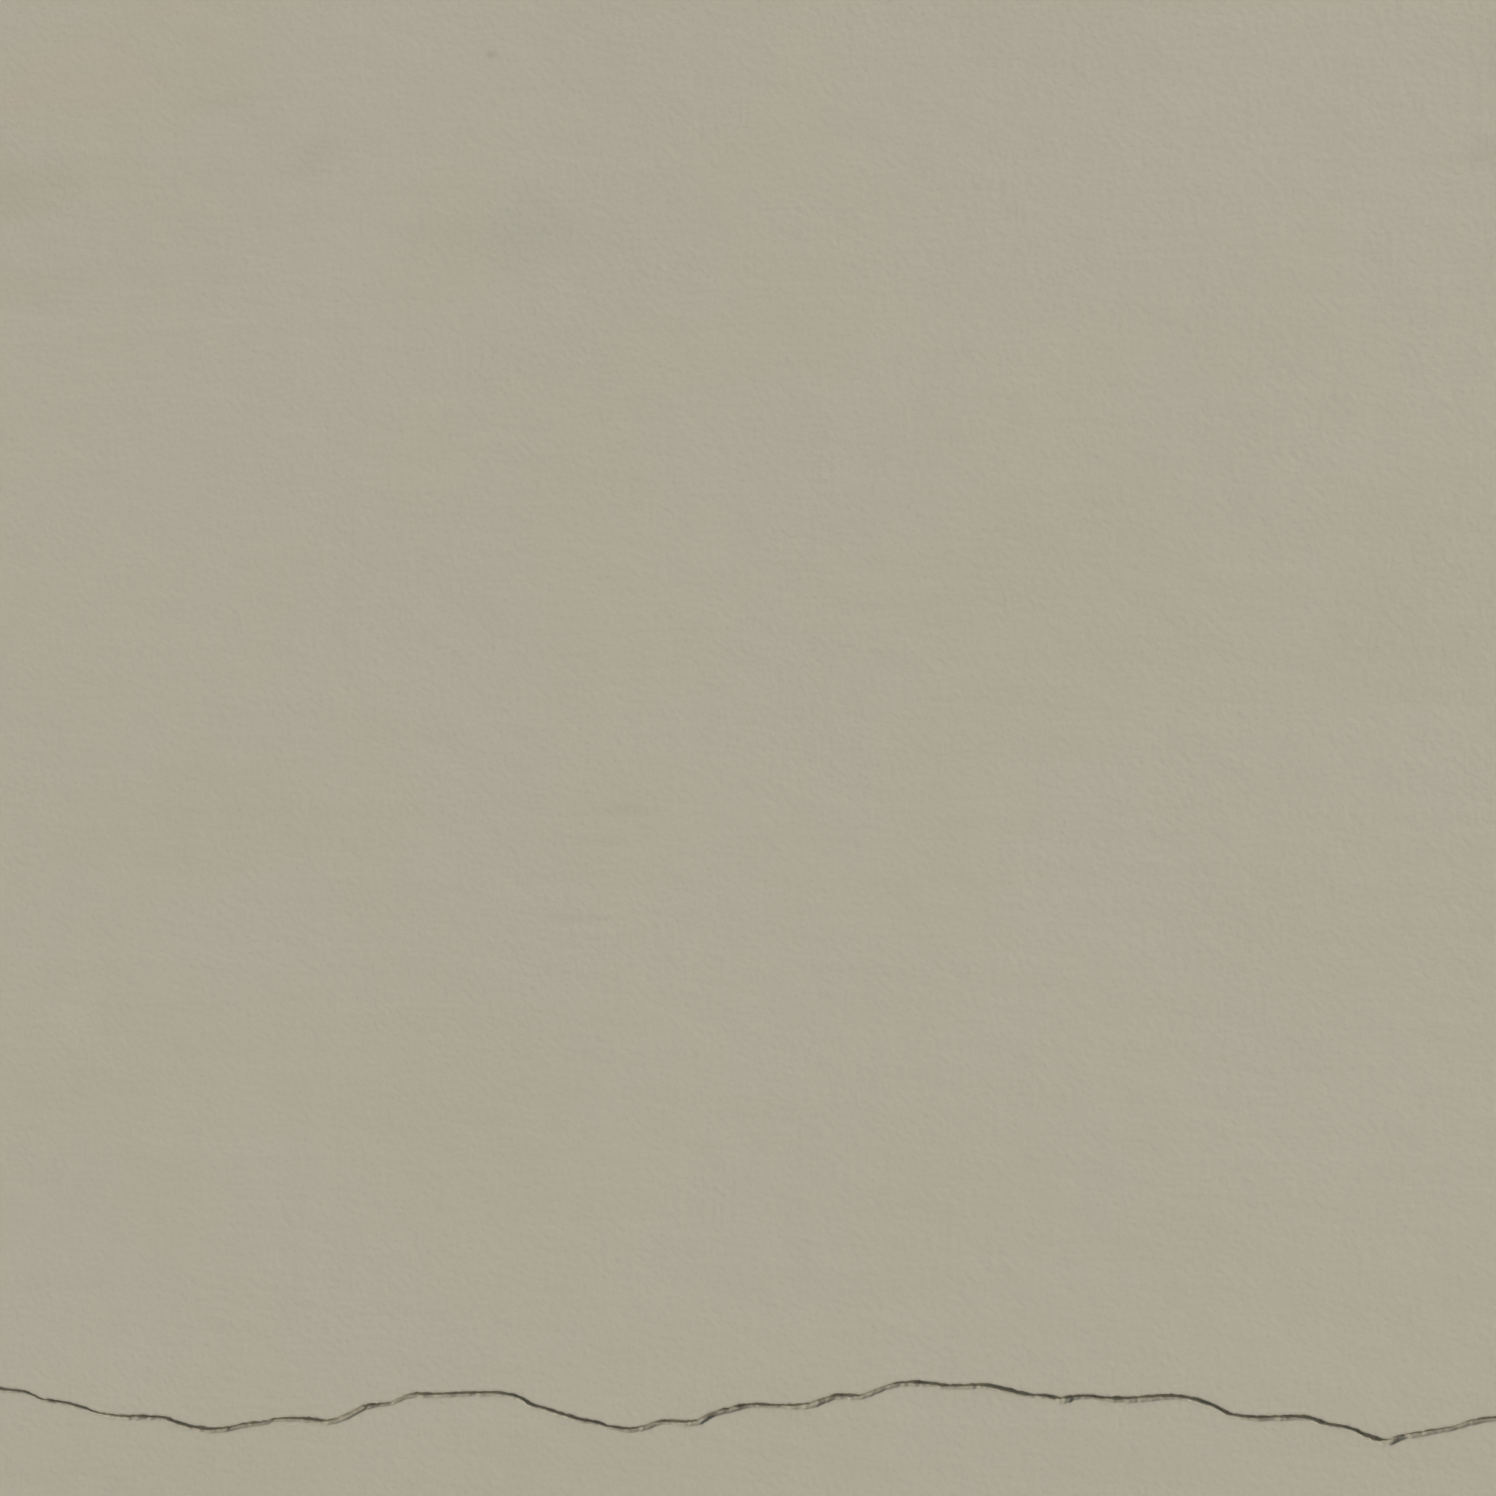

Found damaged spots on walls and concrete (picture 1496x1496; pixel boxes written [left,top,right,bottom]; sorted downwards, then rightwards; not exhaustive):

crack [0,1376,1496,1451]